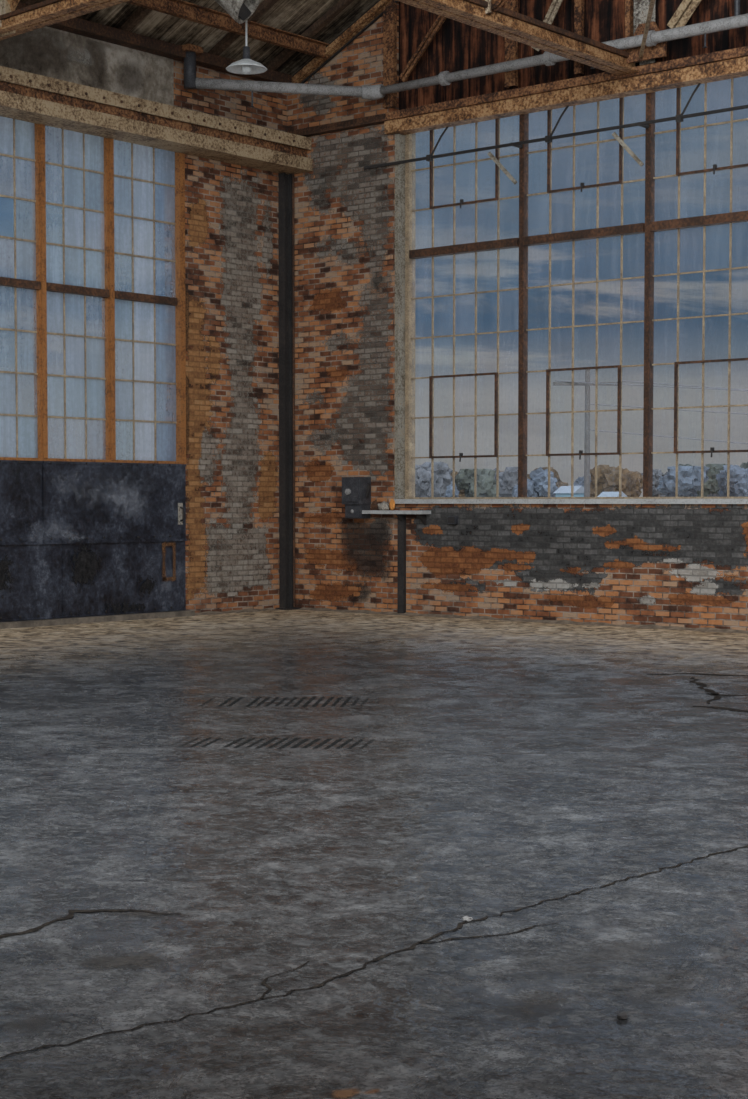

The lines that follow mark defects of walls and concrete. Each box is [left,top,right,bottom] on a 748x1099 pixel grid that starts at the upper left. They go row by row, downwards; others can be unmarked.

peeling [413,504,748,609]
crack [659,673,748,712]
crack [0,845,748,1059]